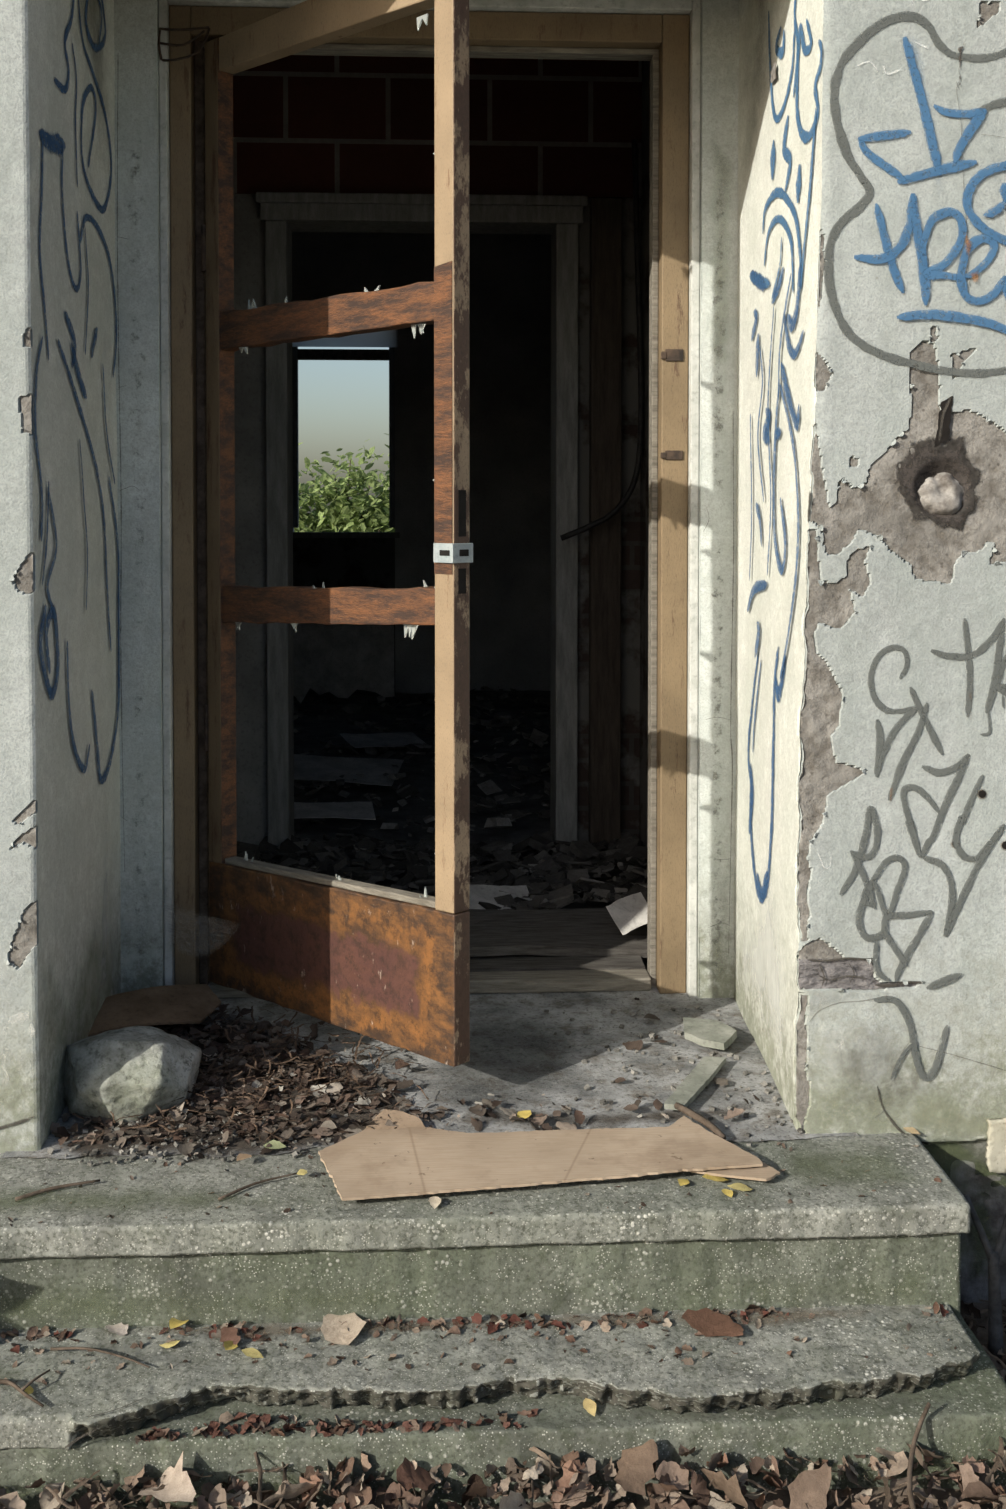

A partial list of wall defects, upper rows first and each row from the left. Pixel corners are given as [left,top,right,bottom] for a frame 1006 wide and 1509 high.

peeling [9,554,33,594]
spalling [796,326,1006,1129]
peeling [11,801,36,849]
peeling [6,902,37,968]